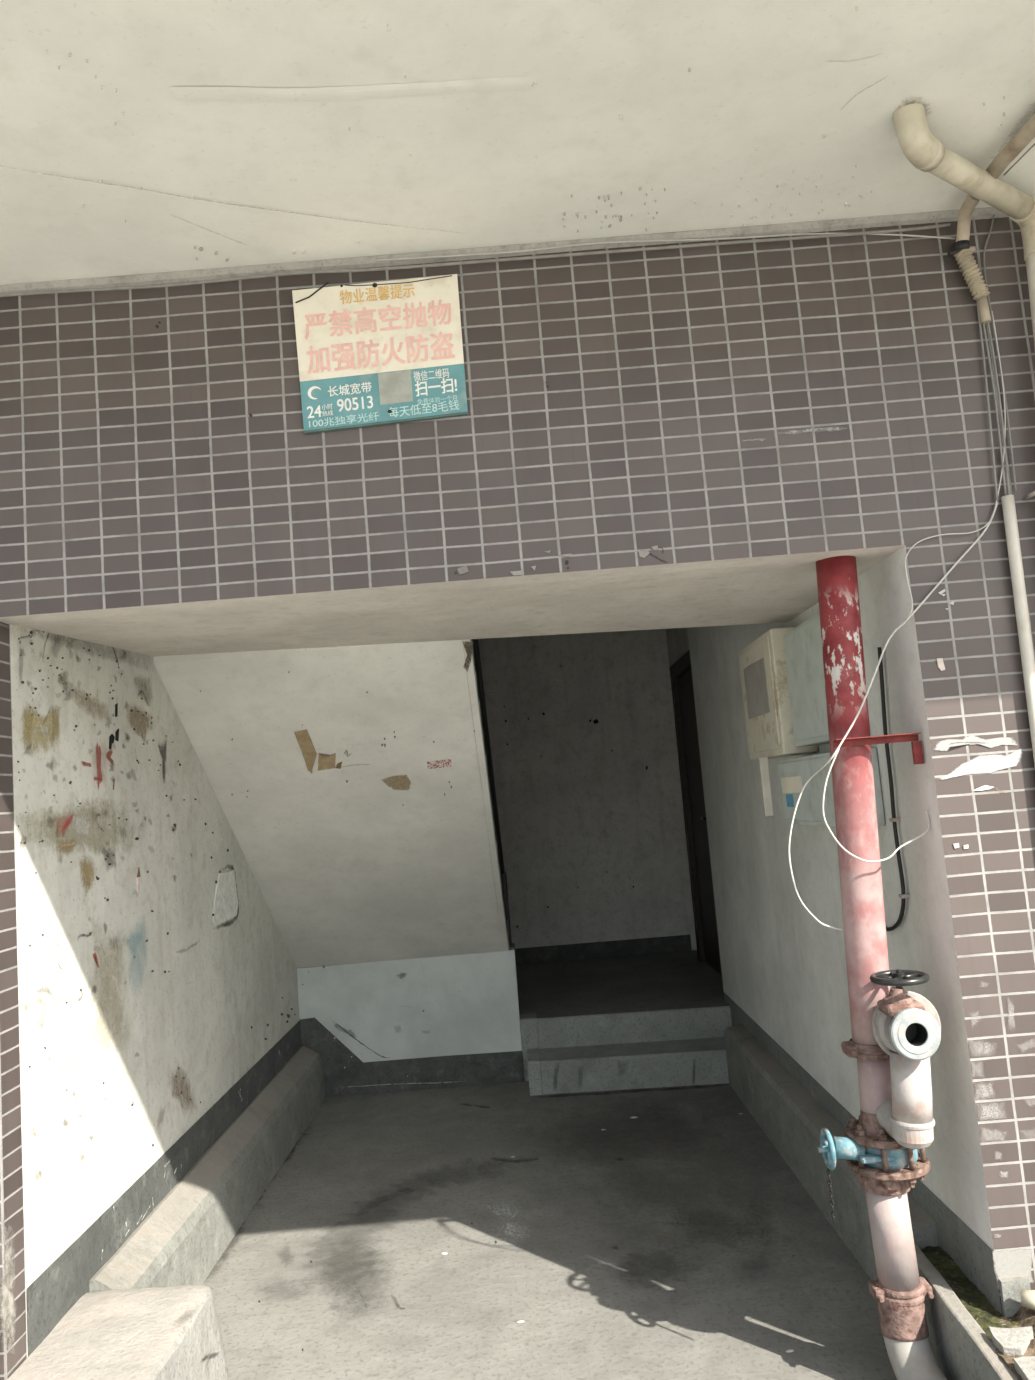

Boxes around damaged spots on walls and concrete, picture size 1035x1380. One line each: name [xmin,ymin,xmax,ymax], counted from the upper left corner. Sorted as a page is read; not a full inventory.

peeling [21,647,181,778]
peeling [294,725,348,783]